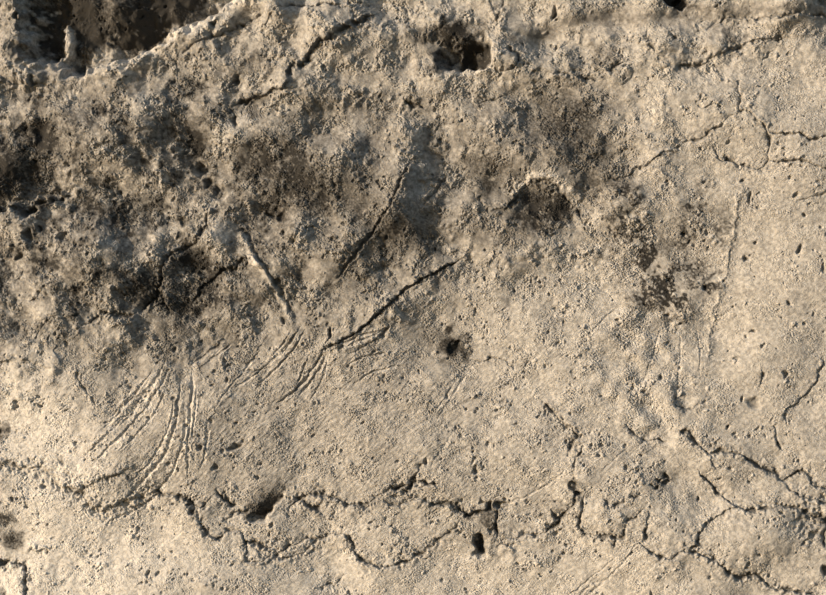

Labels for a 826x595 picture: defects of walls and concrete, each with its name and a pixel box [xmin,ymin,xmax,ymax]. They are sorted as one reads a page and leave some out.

crack [182,0,382,130]
crack [609,80,826,182]
crack [796,192,826,203]
crack [85,213,252,327]
crack [0,453,463,595]
crack [497,354,826,595]